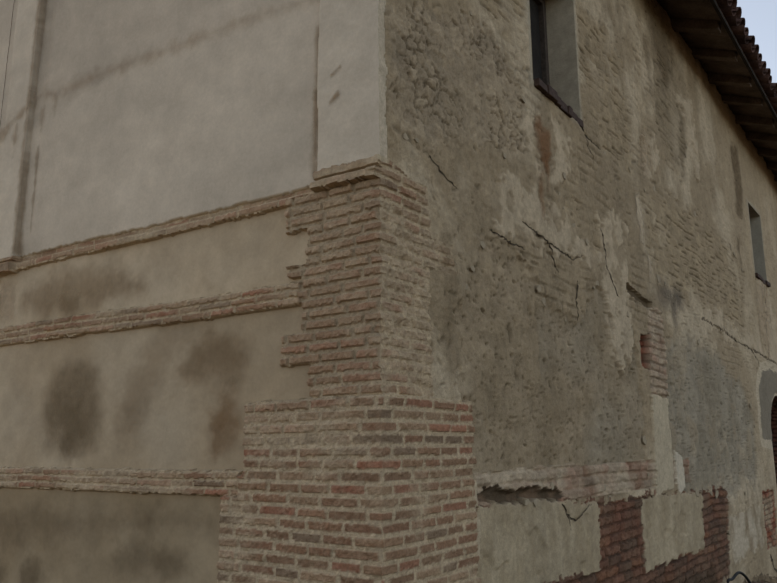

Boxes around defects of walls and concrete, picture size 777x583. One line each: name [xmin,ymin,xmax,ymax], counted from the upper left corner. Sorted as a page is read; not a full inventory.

crack [491,221,583,273]
crack [600,229,619,297]
spalling [476,329,777,583]